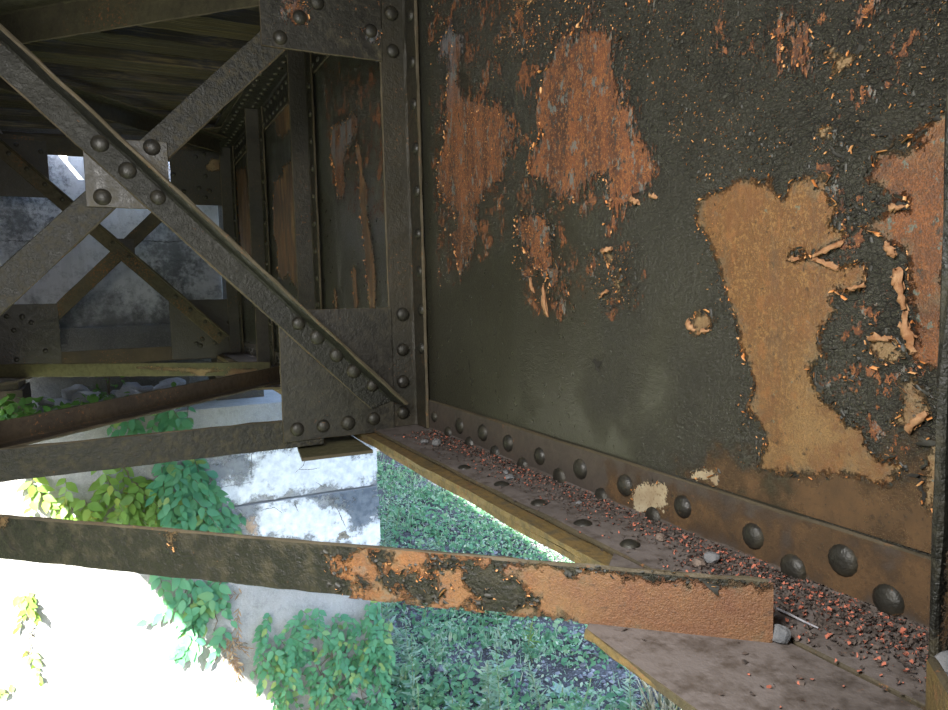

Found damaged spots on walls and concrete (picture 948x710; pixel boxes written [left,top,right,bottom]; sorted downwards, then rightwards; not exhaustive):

corrosion [351,136,377,308]
peeling [426,0,947,513]
peeling [320,549,530,612]